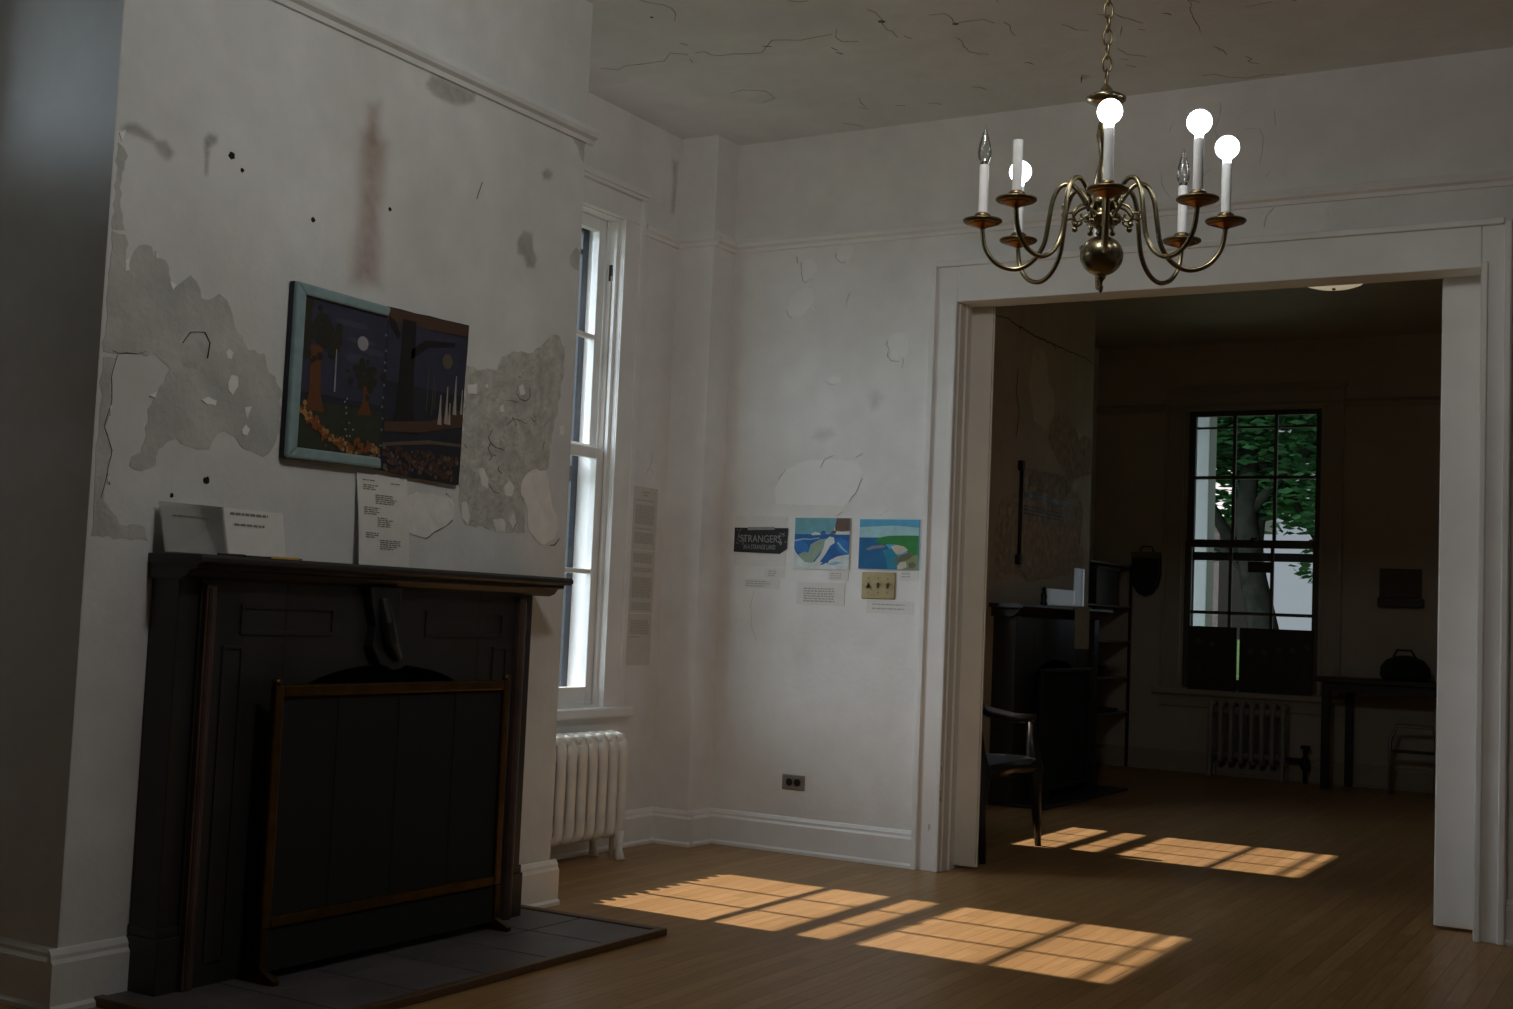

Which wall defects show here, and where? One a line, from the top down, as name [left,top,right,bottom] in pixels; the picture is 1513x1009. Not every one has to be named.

crack [1190,0,1286,177]
peeling [91,130,282,541]
peeling [459,335,565,546]